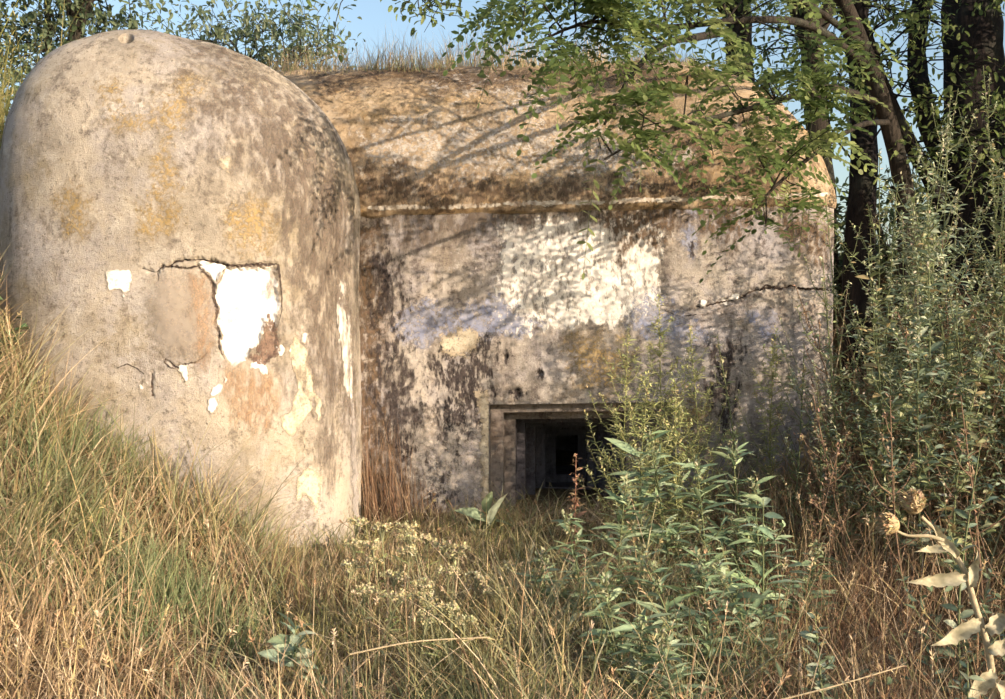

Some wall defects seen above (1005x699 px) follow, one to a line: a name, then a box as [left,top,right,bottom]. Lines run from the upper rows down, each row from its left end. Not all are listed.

peeling [106,269,132,297]
spalling [197,260,322,437]
water stain [178,38,834,519]
peeling [367,195,754,354]
crack [665,284,832,317]